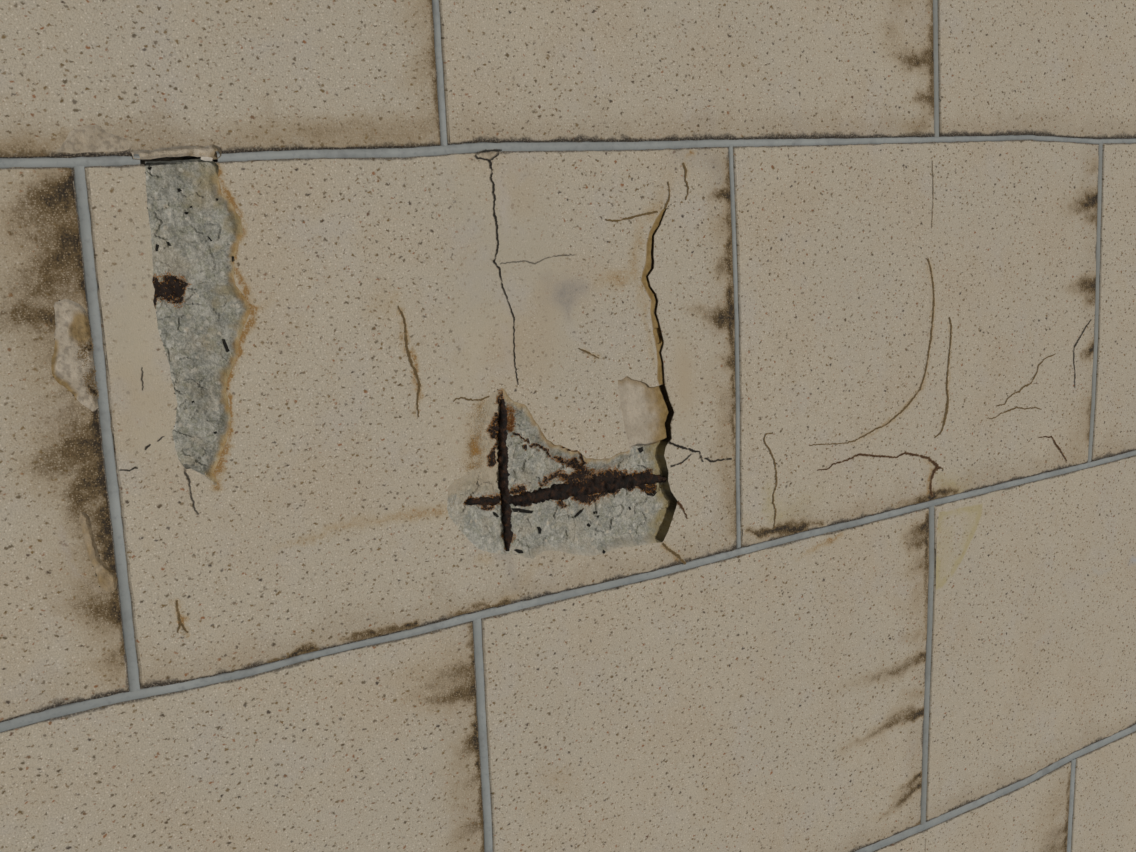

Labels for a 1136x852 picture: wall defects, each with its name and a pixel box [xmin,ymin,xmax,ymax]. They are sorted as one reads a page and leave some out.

damp [0,118,127,694]
spalling [51,125,279,499]
crack [354,270,490,423]
crack [475,149,519,385]
spalling [447,376,678,559]
crack [602,162,689,385]
crack [658,501,691,565]
crack [764,432,778,528]
crack [809,254,955,501]
damp [833,502,984,762]
crack [989,320,1091,461]
damp [866,768,922,830]